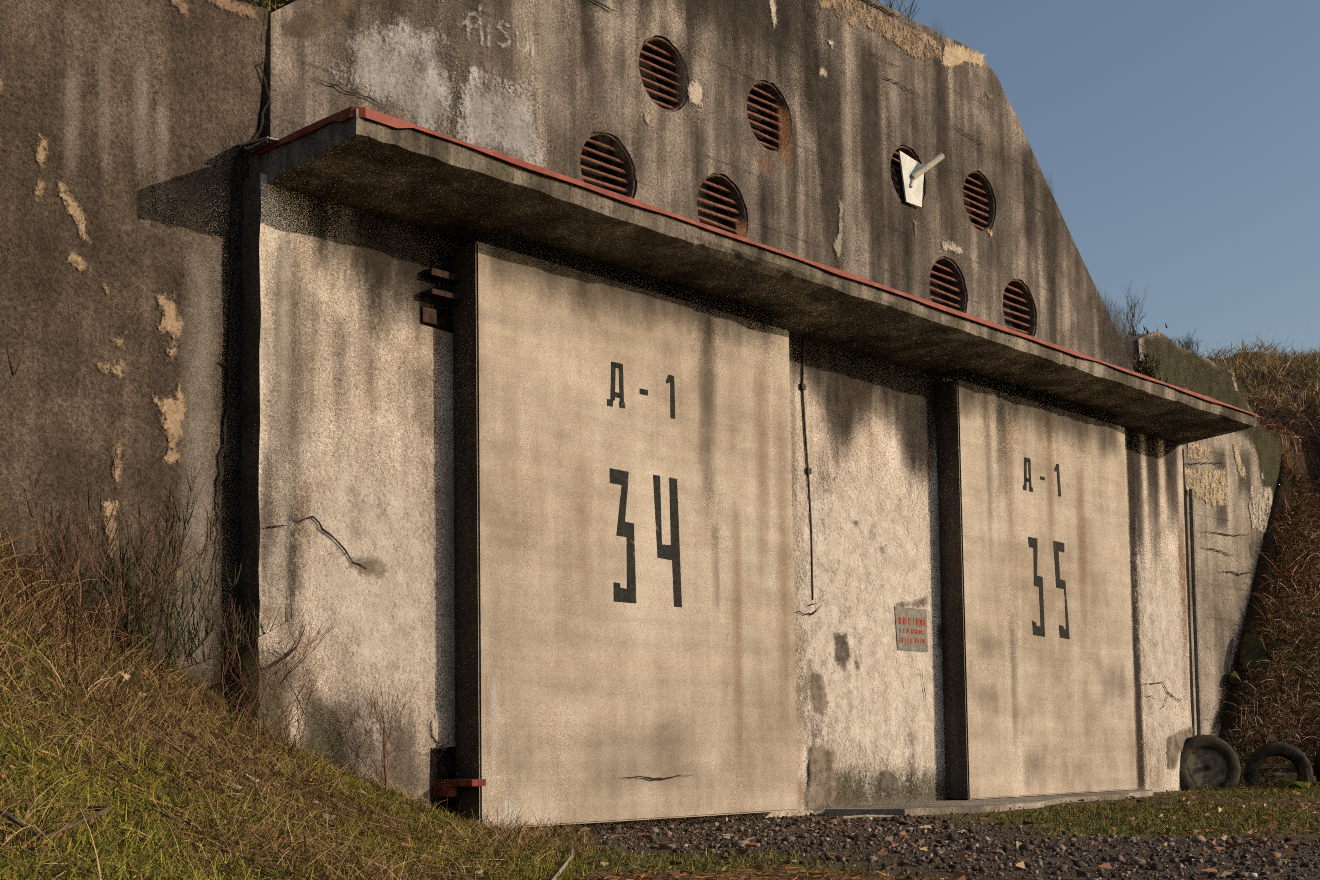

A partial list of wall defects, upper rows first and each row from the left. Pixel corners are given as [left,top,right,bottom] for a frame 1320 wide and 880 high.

peeling [819,0,985,69]
peeling [35,134,91,242]
crack [316,78,387,106]
water stain [862,47,885,283]
water stain [933,32,953,231]
peeling [157,293,183,357]
water stain [495,240,772,331]
water stain [1023,154,1057,337]
peeling [152,383,188,463]
peeling [90,441,122,557]
crack [266,515,367,569]
water stain [789,333,1178,788]